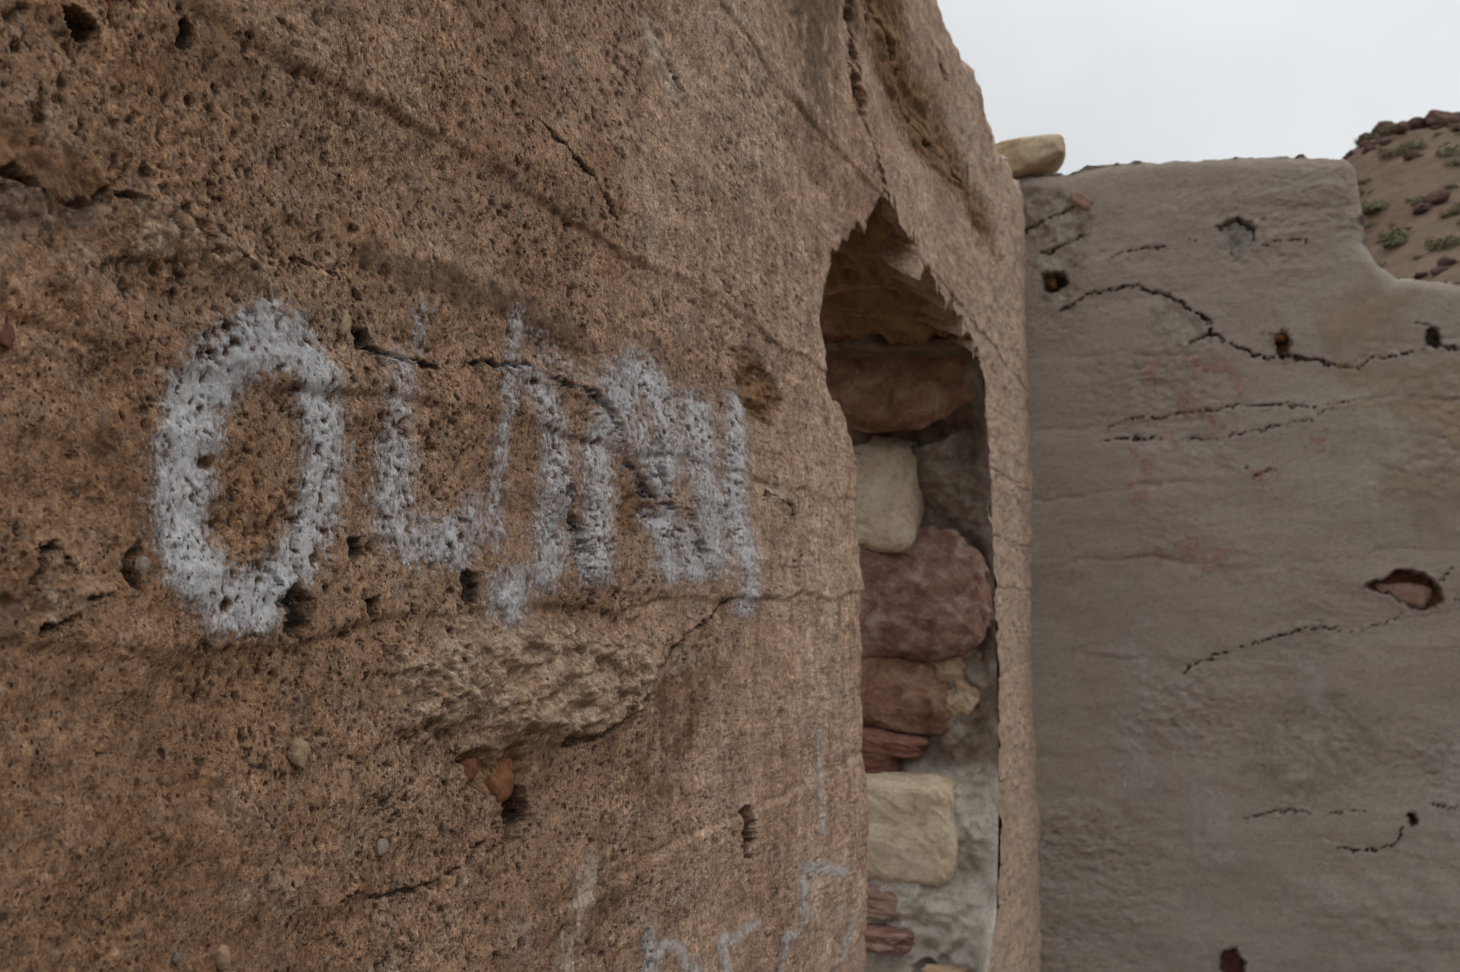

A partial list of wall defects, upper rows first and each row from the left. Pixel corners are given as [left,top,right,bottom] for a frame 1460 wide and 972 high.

crack [545,126,618,228]
spalling [1218,217,1255,261]
crack [1060,238,1457,441]
crack [1183,613,1402,674]
crack [560,713,634,747]
crack [1244,803,1458,853]